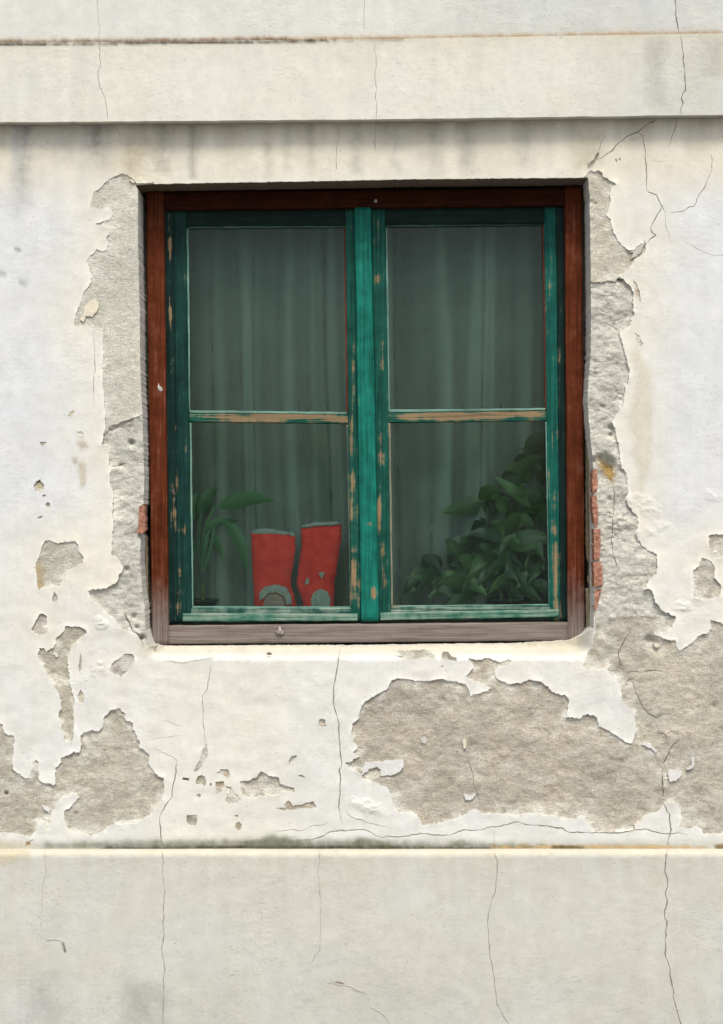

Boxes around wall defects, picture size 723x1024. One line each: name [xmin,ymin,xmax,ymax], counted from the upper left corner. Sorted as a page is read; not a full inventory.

crack [598,0,713,243]
peeling [36,540,84,603]
flaking render [0,613,165,845]
peeling [74,174,154,648]
crack [156,657,212,1024]
flaking render [183,744,316,830]
crack [279,632,683,1024]
flaking render [345,153,723,834]